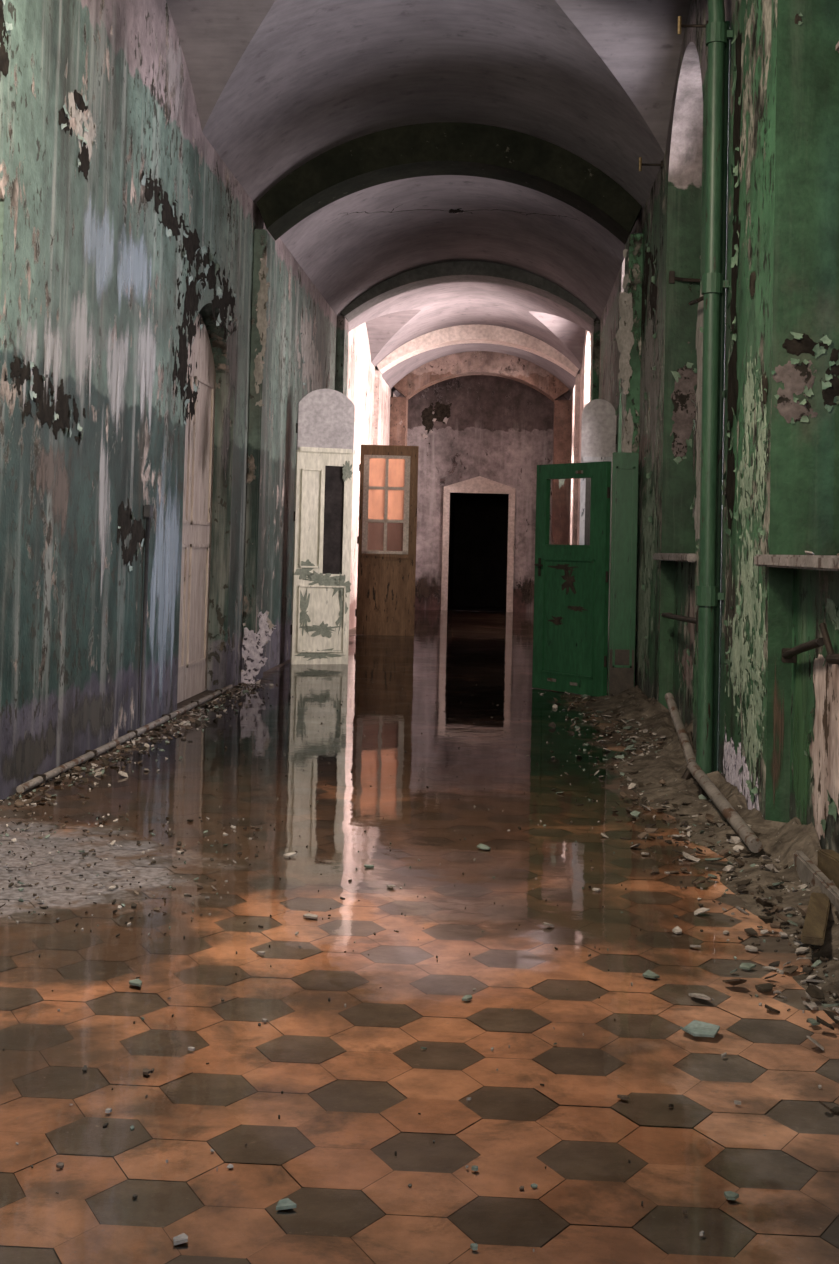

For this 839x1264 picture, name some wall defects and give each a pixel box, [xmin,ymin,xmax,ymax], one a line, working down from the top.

peeling [0,0,13,77]
flaking render [58,90,97,182]
peeling [141,168,237,425]
flaking render [254,258,270,406]
peeling [4,355,86,445]
peeling [342,461,353,482]
flaking render [670,280,704,550]
peeling [719,31,839,840]
flaking render [241,611,276,684]
peeling [293,559,351,661]